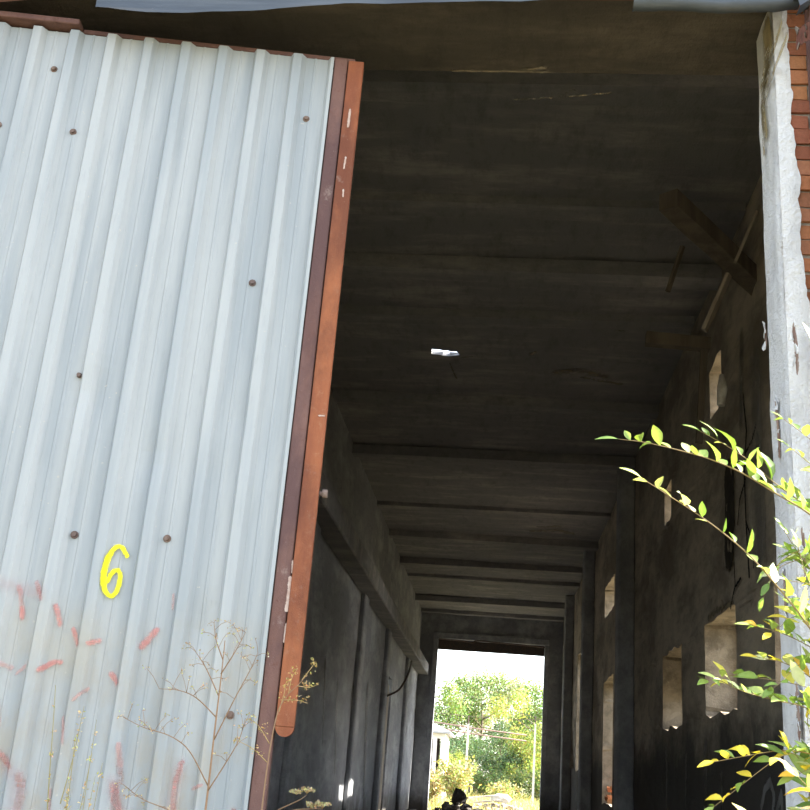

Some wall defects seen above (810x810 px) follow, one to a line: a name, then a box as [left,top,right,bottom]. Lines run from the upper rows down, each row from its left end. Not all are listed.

damp [761,14,787,155]